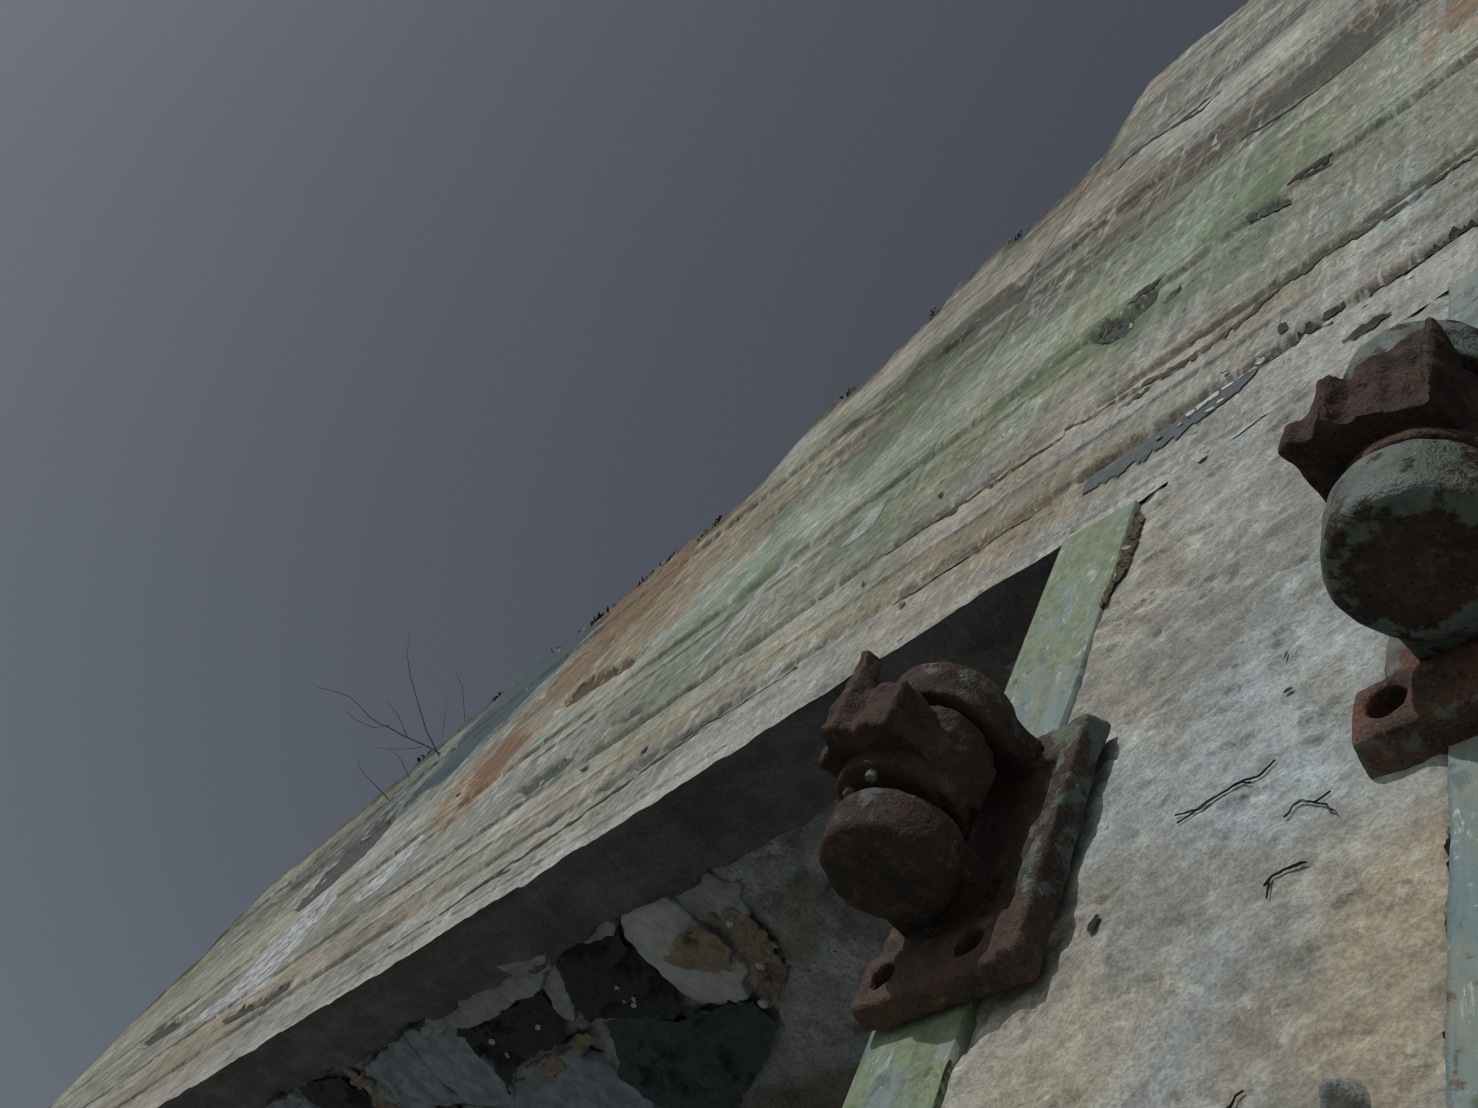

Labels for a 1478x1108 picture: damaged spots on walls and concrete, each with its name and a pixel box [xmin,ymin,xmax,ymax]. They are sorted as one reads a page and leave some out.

spalling [296,819,391,911]
spalling [222,981,291,1025]
peeling [343,869,787,1108]
peeling [265,1089,321,1108]